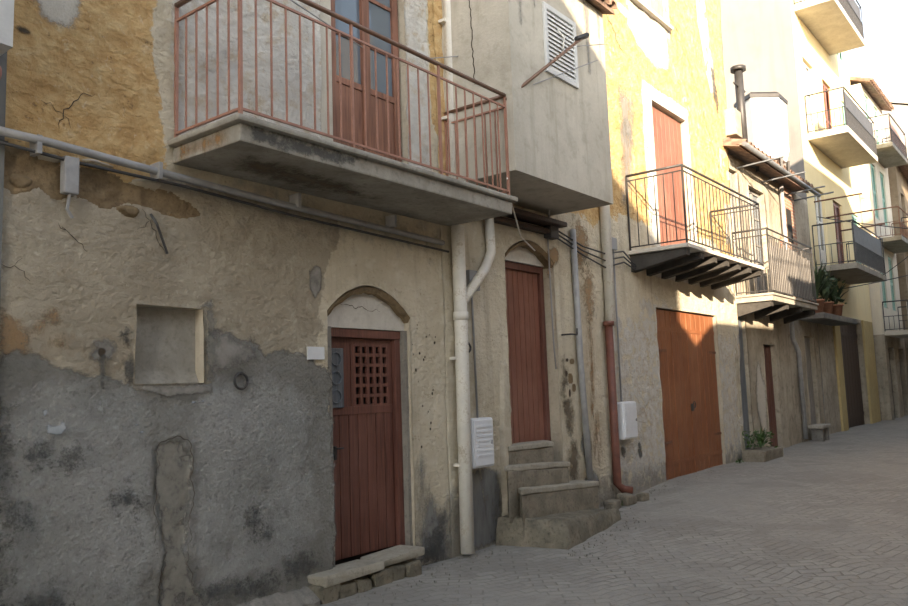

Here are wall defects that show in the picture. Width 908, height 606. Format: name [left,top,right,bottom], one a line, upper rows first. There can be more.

peeling [38,0,80,28]
crack [468,0,476,79]
peeling [616,1,669,70]
crack [41,93,95,128]
flaking render [4,146,201,219]
flaking render [153,436,205,606]